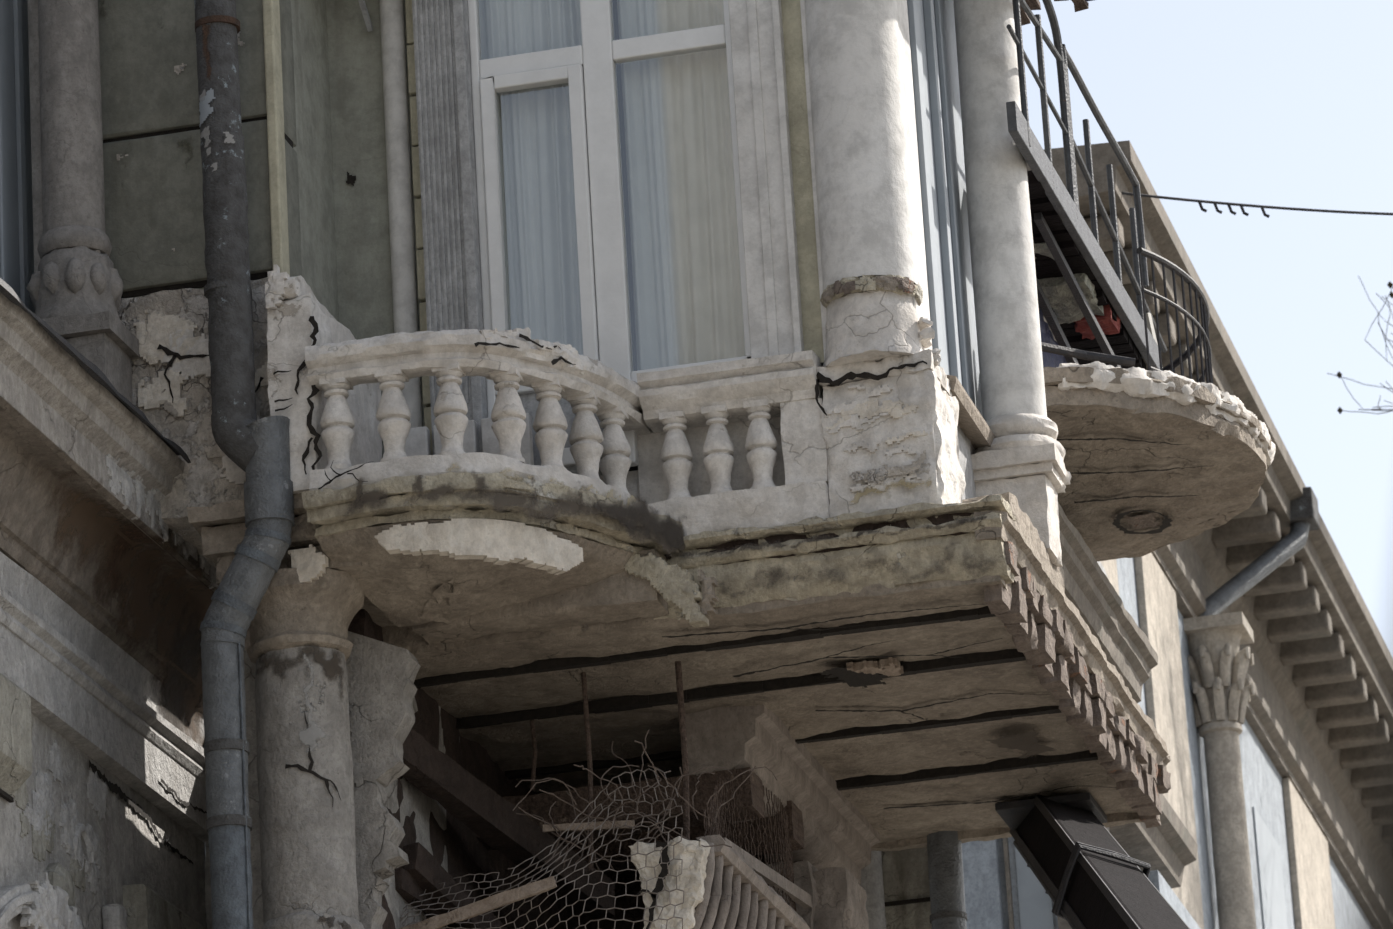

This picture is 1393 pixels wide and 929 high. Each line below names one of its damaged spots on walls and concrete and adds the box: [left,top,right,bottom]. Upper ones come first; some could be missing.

peeling [199,88,235,172]
peeling [265,264,289,311]
spalling [822,275,941,366]
peeling [133,310,211,419]
peeling [825,384,932,503]
spalling [374,518,583,575]
spalling [348,609,383,642]
spalling [624,552,719,628]
crack [662,604,1003,677]
crack [815,693,1037,720]
crack [285,711,341,807]
spalling [382,661,804,929]